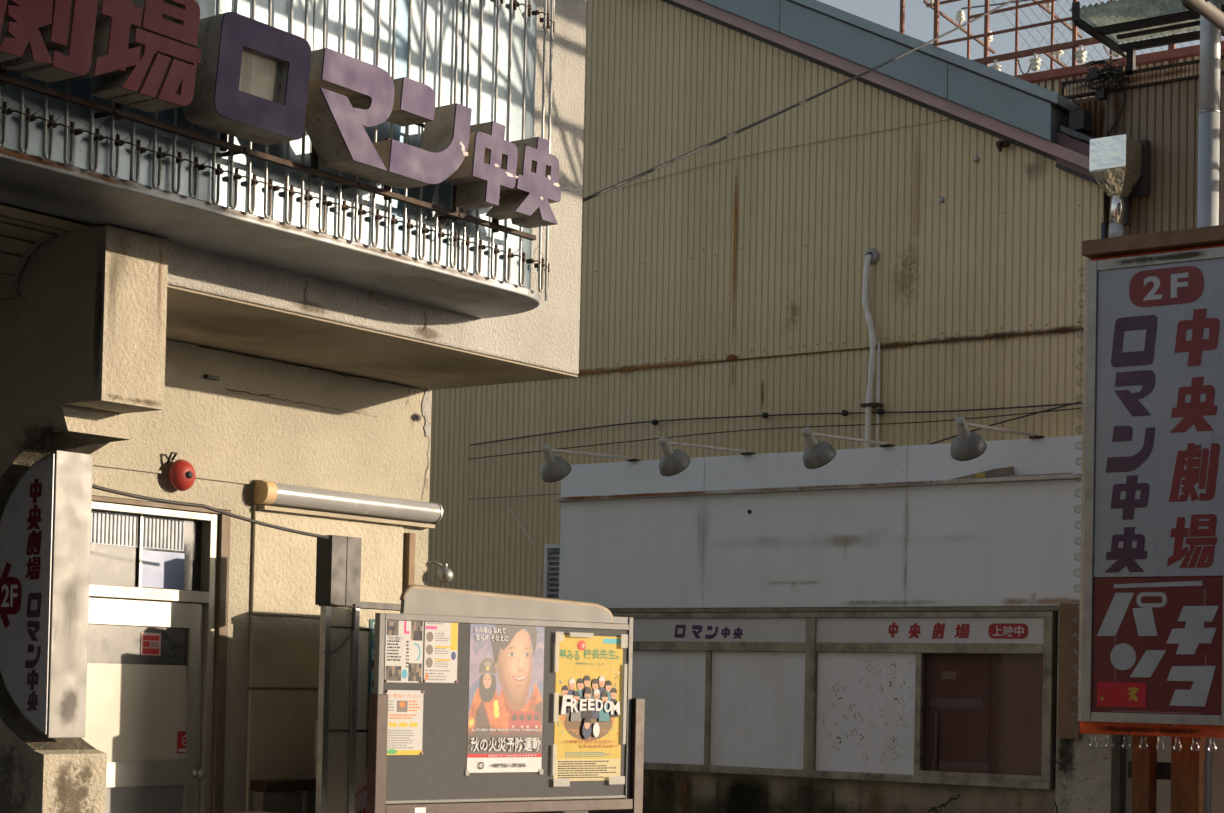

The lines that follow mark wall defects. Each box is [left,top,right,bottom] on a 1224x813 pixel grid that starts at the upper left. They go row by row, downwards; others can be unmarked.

rust [880,327,1075,348]
crack [199,346,422,411]
crack [225,388,377,417]